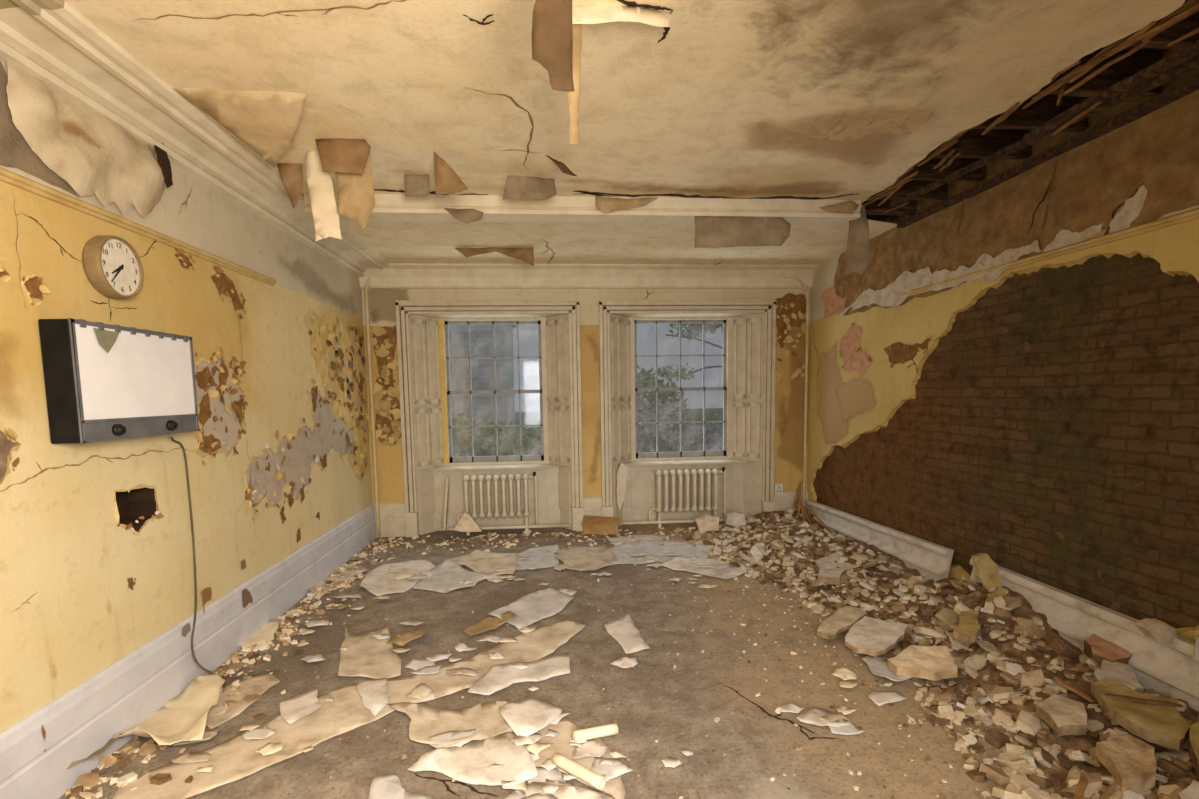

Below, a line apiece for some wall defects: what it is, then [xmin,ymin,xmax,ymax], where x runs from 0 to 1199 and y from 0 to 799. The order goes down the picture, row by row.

peeling [0,257,51,307]
peeling [774,293,806,382]
flaking render [810,49,1199,633]
peeling [193,310,406,524]
peeling [0,427,21,497]